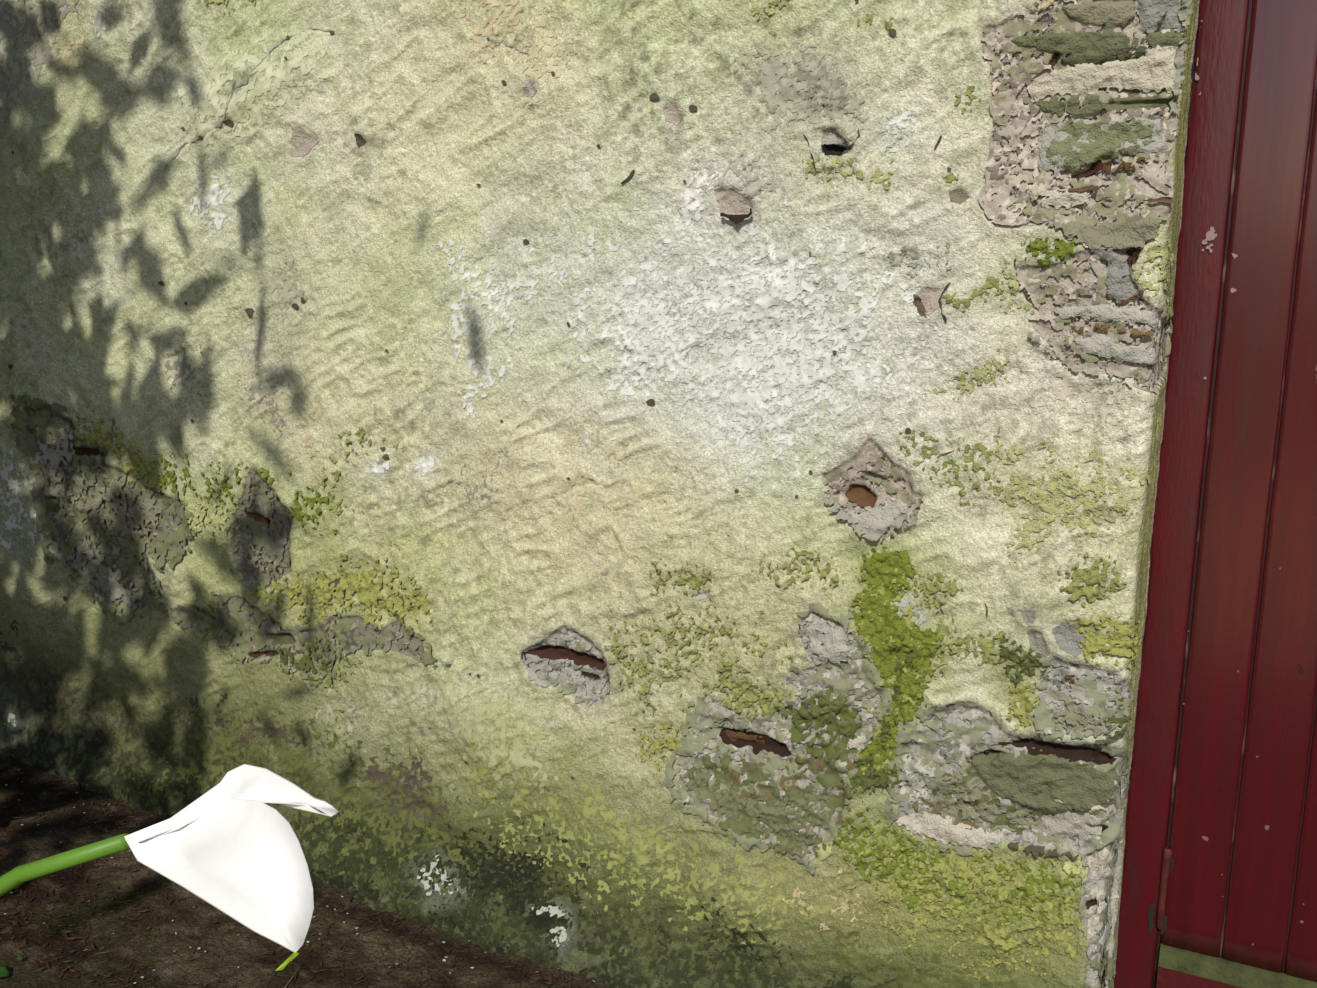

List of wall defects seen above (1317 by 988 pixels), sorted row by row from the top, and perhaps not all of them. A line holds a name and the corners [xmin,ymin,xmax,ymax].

spalling [949,0,1193,393]
damp [0,430,45,552]
spalling [8,394,437,680]
damp [371,458,390,473]
spalling [821,438,923,541]
damp [893,593,929,624]
damp [0,711,90,789]
damp [163,678,363,757]
spalling [520,626,611,707]
spalling [663,603,1134,988]
damp [291,756,794,988]
damp [816,974,856,988]